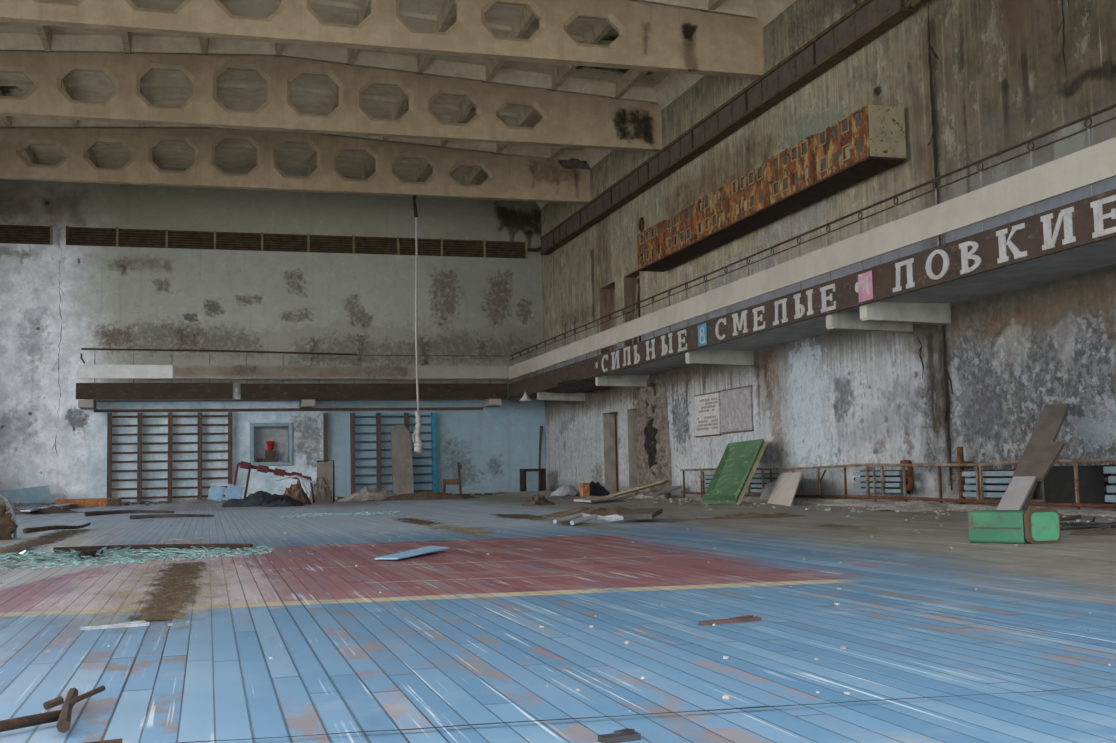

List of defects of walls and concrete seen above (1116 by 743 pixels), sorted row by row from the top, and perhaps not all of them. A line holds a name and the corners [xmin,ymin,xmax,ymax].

water stain [1059,61,1116,97]
water stain [613,111,654,144]
water stain [495,202,541,238]
peeling [184,300,223,322]
spalling [644,404,658,476]
peeling [671,393,690,456]
peeling [774,336,853,476]
peeling [1073,396,1116,459]